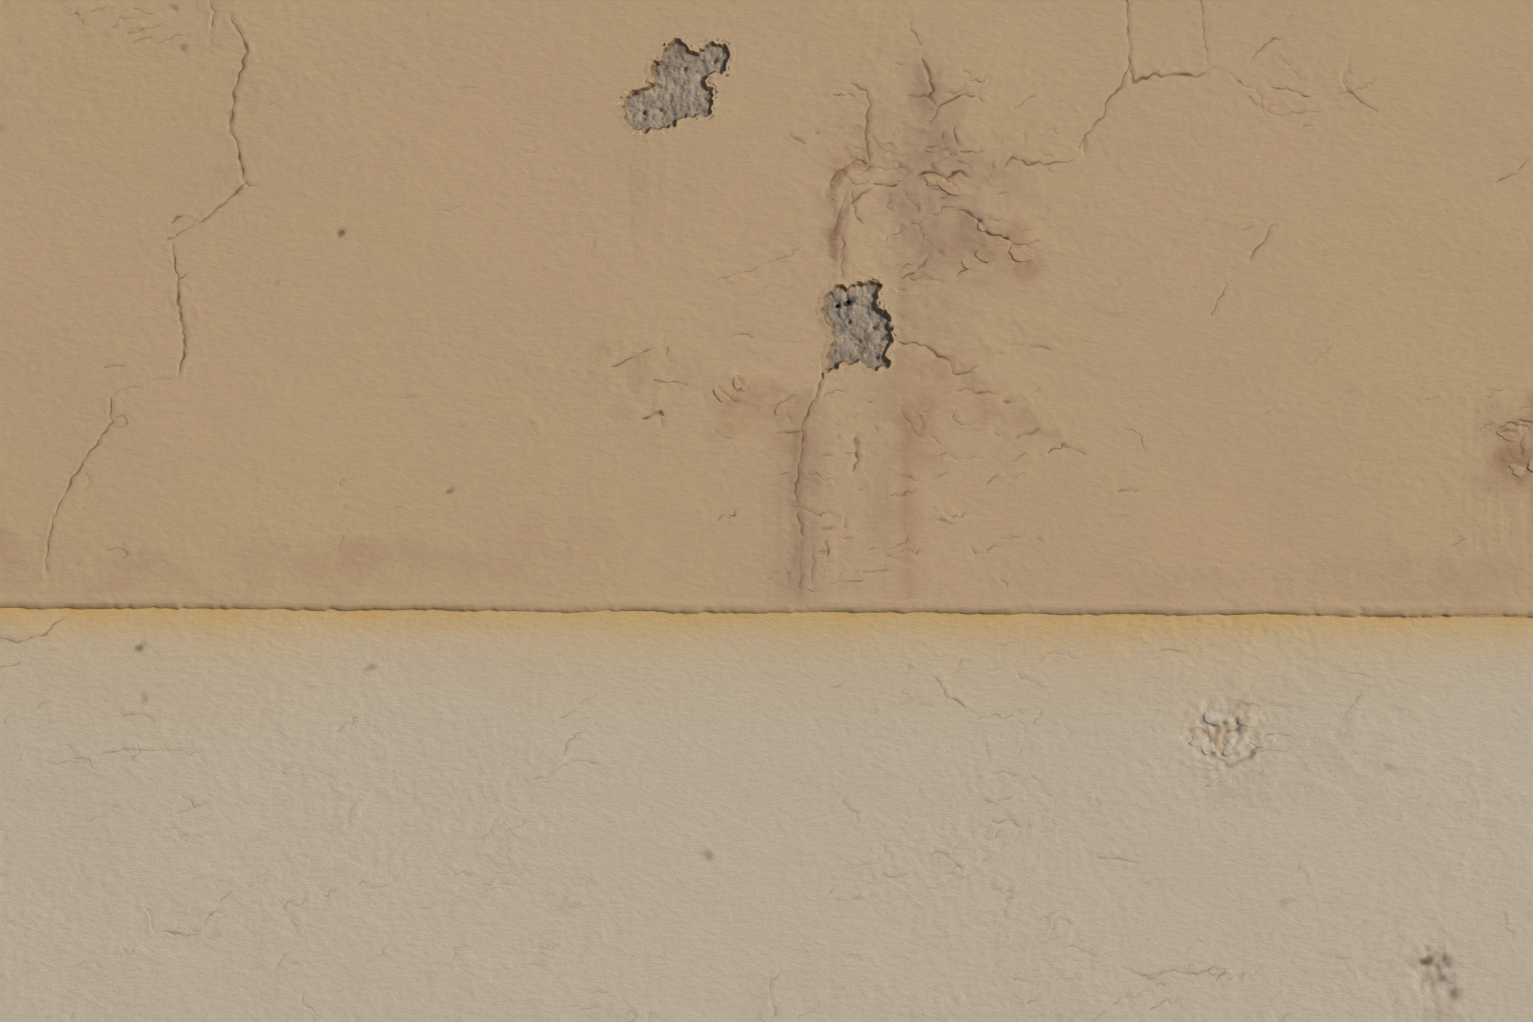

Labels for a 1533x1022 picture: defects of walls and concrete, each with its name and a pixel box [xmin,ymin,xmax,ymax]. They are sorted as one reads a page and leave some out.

crack [212,19,247,194]
leakage [195,0,271,120]
spalling [616,32,736,138]
crack [830,58,979,243]
crack [965,210,1008,239]
crack [171,223,186,368]
spalling [814,275,900,380]
leakage [0,29,1533,823]
spalling [1183,699,1285,815]